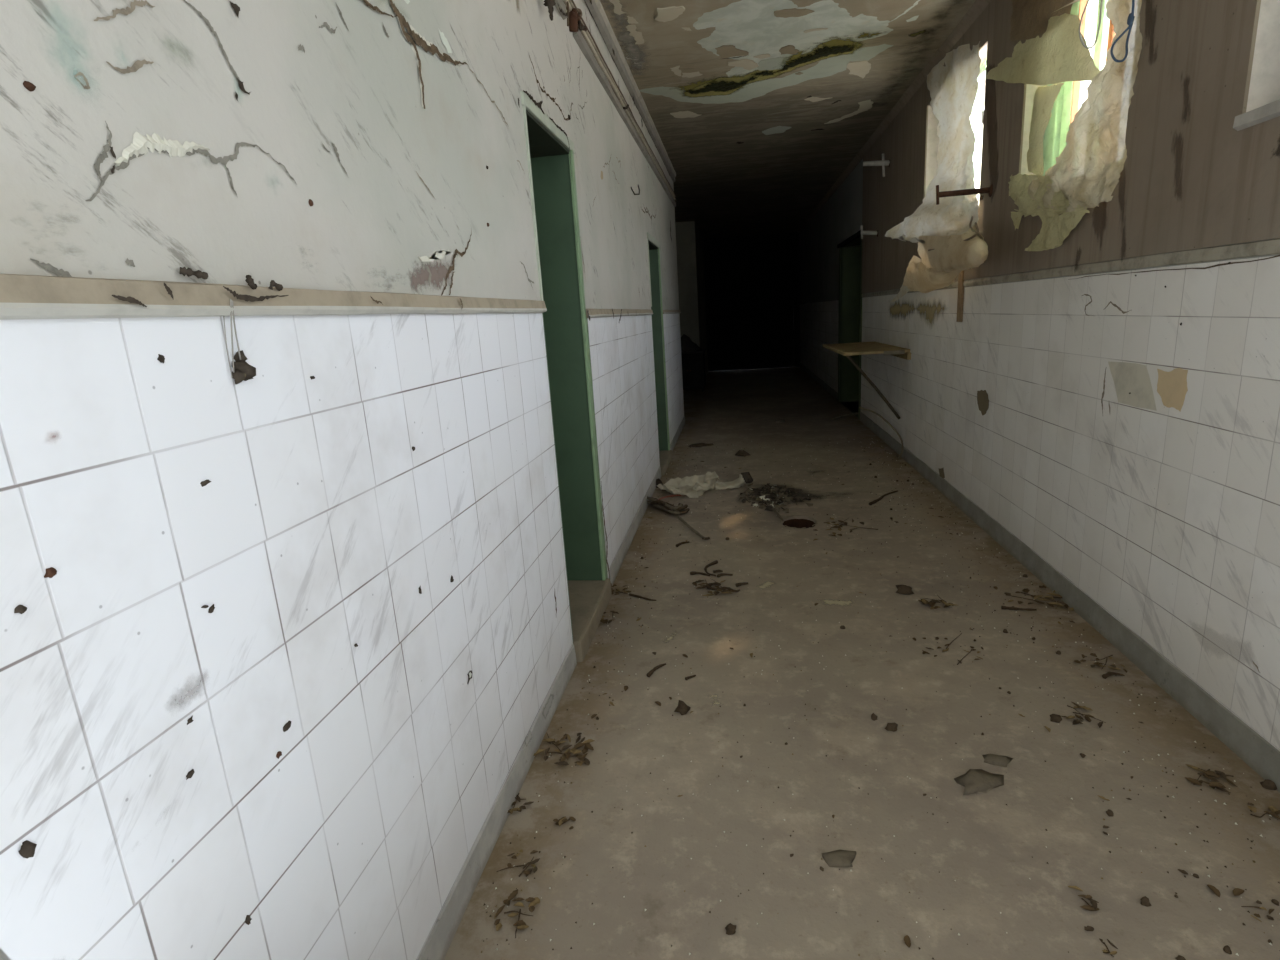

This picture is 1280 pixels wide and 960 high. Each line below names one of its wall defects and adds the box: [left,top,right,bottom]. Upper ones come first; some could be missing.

peeling [609,0,644,44]
crack [74,59,154,89]
crack [94,0,251,101]
crack [298,0,670,176]
peeling [639,0,919,118]
peeling [824,100,874,124]
crack [86,121,296,201]
crack [1068,255,1280,280]
peeling [1108,362,1188,411]